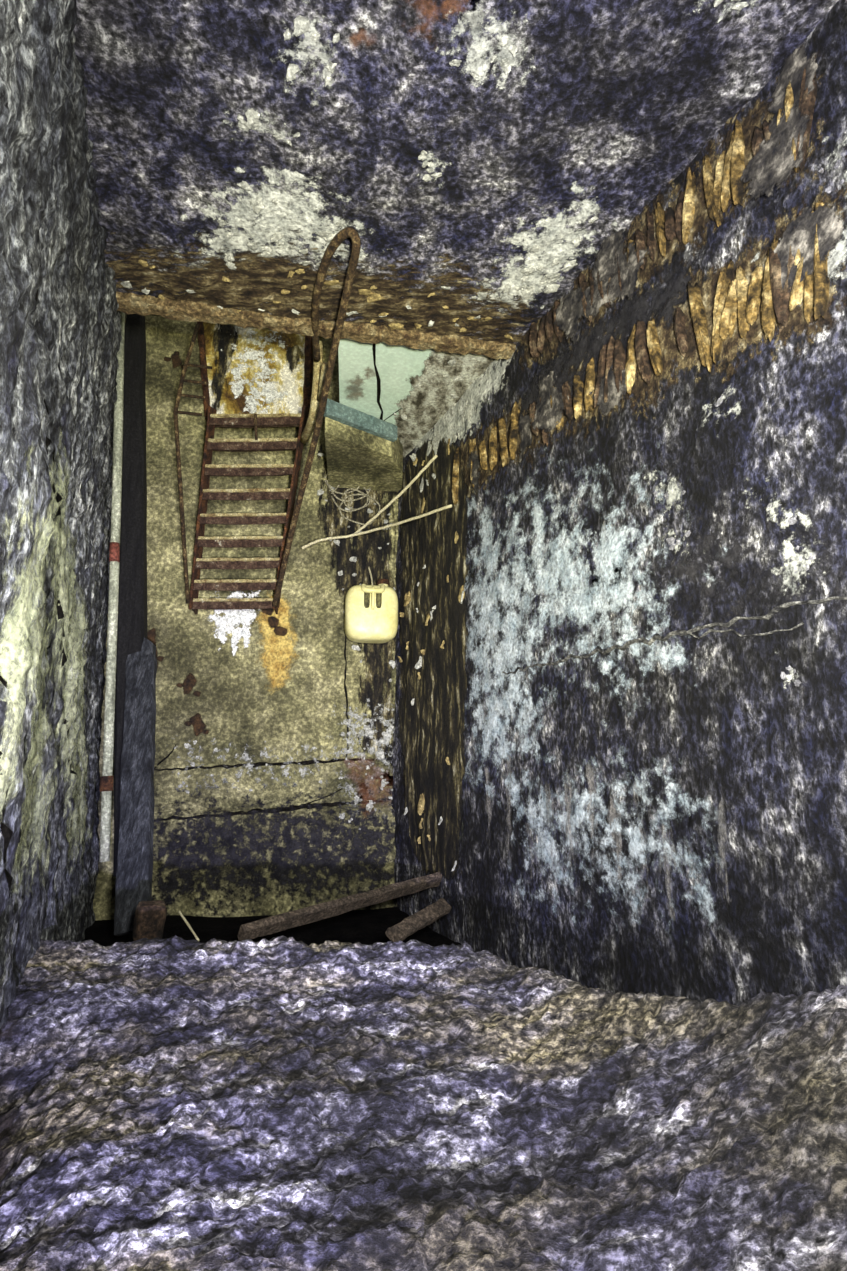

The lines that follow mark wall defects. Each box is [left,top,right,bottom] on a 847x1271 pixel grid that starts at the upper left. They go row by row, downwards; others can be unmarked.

rust [257,596,297,688]
peeling [104,41,847,880]
leakage [464,471,714,921]
crack [502,596,847,675]